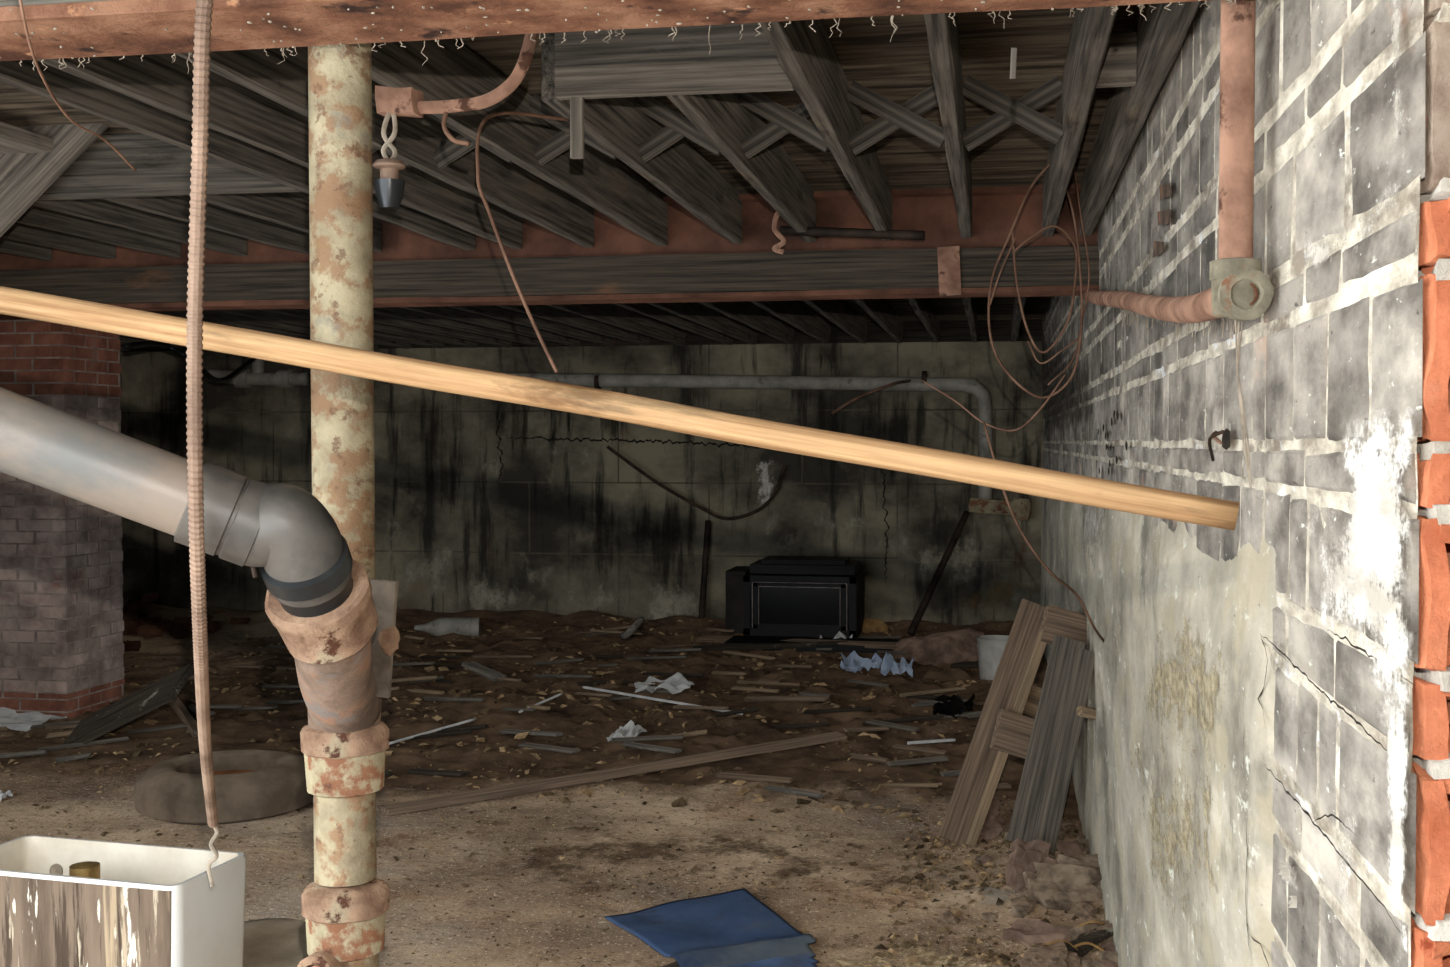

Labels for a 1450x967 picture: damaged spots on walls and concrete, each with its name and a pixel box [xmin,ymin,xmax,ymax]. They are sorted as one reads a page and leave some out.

water stain [756,461,774,504]
water stain [1307,412,1413,951]
crack [1327,629,1415,686]